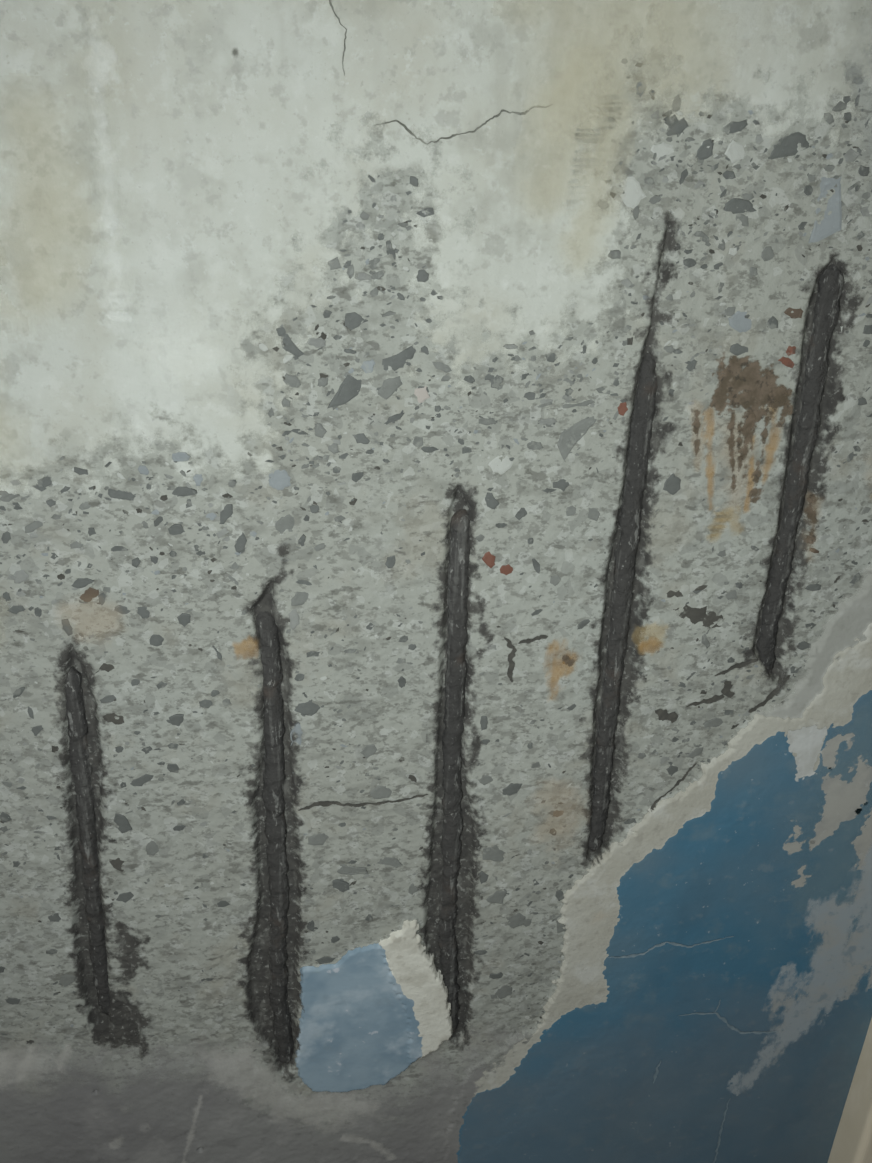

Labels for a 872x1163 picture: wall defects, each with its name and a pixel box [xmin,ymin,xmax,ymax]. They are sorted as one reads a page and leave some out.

crack [329,0,347,76]
crack [375,104,553,145]
corrosion [692,356,793,503]
spalling [744,253,863,683]
crack [298,794,428,811]
peeling [456,565,872,1163]
peeling [295,920,452,1092]